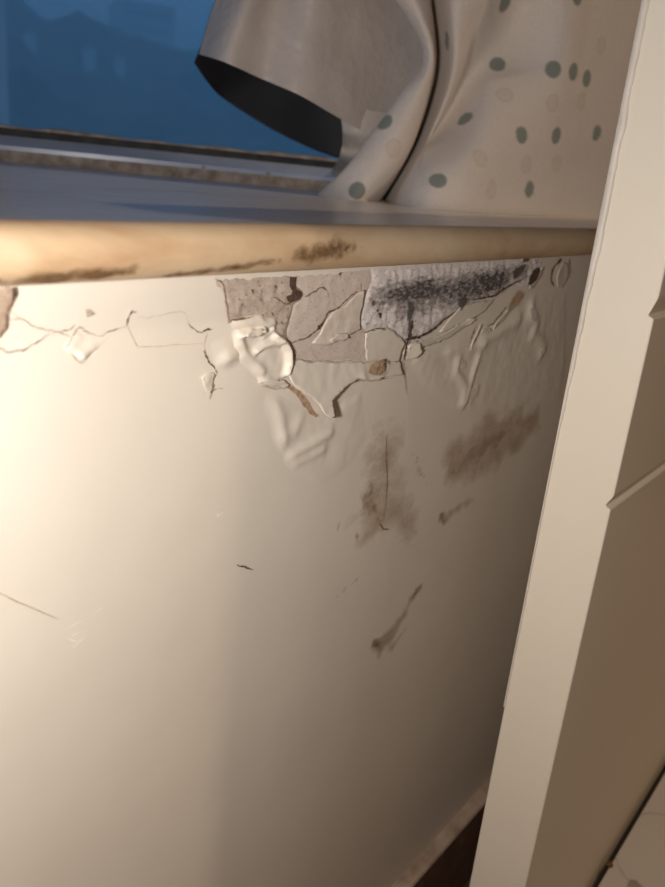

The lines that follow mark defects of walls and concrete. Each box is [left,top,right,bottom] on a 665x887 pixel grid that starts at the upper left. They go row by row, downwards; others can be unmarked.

spalling [0,286,17,337]
crack [0,307,74,353]
crack [103,311,211,347]
spalling [201,258,571,419]
crack [403,320,413,393]
water stain [380,265,526,334]
crack [468,307,511,350]